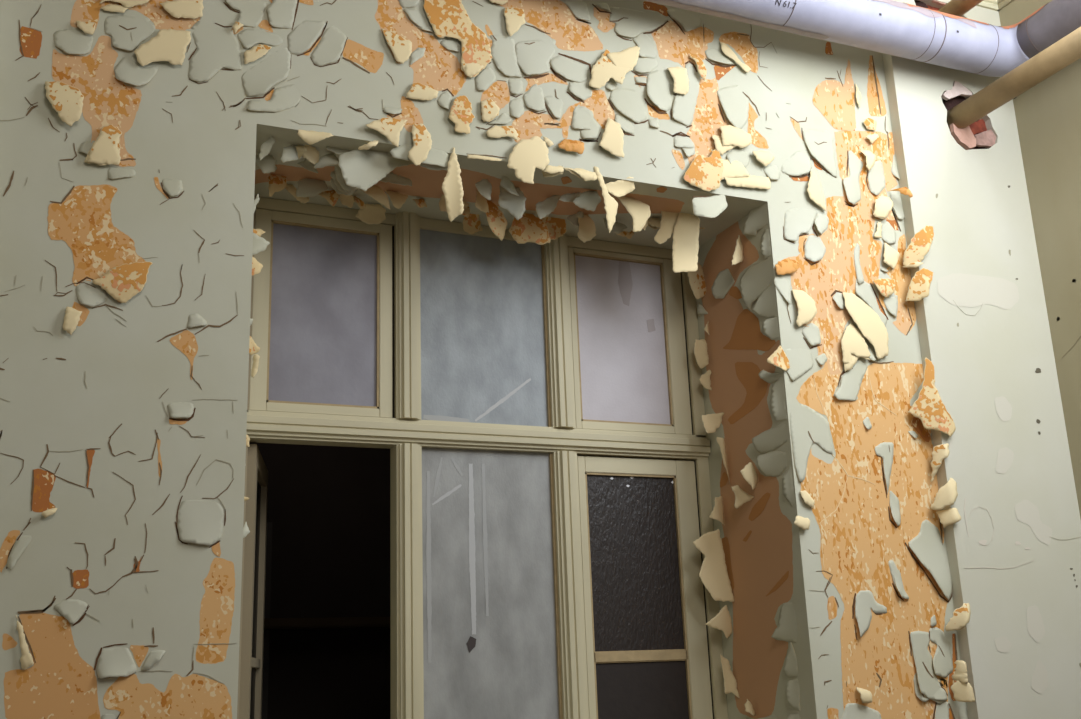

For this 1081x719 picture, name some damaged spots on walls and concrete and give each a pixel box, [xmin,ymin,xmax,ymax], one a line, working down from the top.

crack [0,6,77,204]
peeling [226,0,769,170]
peeling [47,184,146,326]
crack [142,171,244,307]
peeling [170,314,207,380]
peeling [252,55,972,719]
peeling [32,469,56,512]
crack [0,294,238,663]
peeling [0,500,235,719]
crack [94,619,236,684]